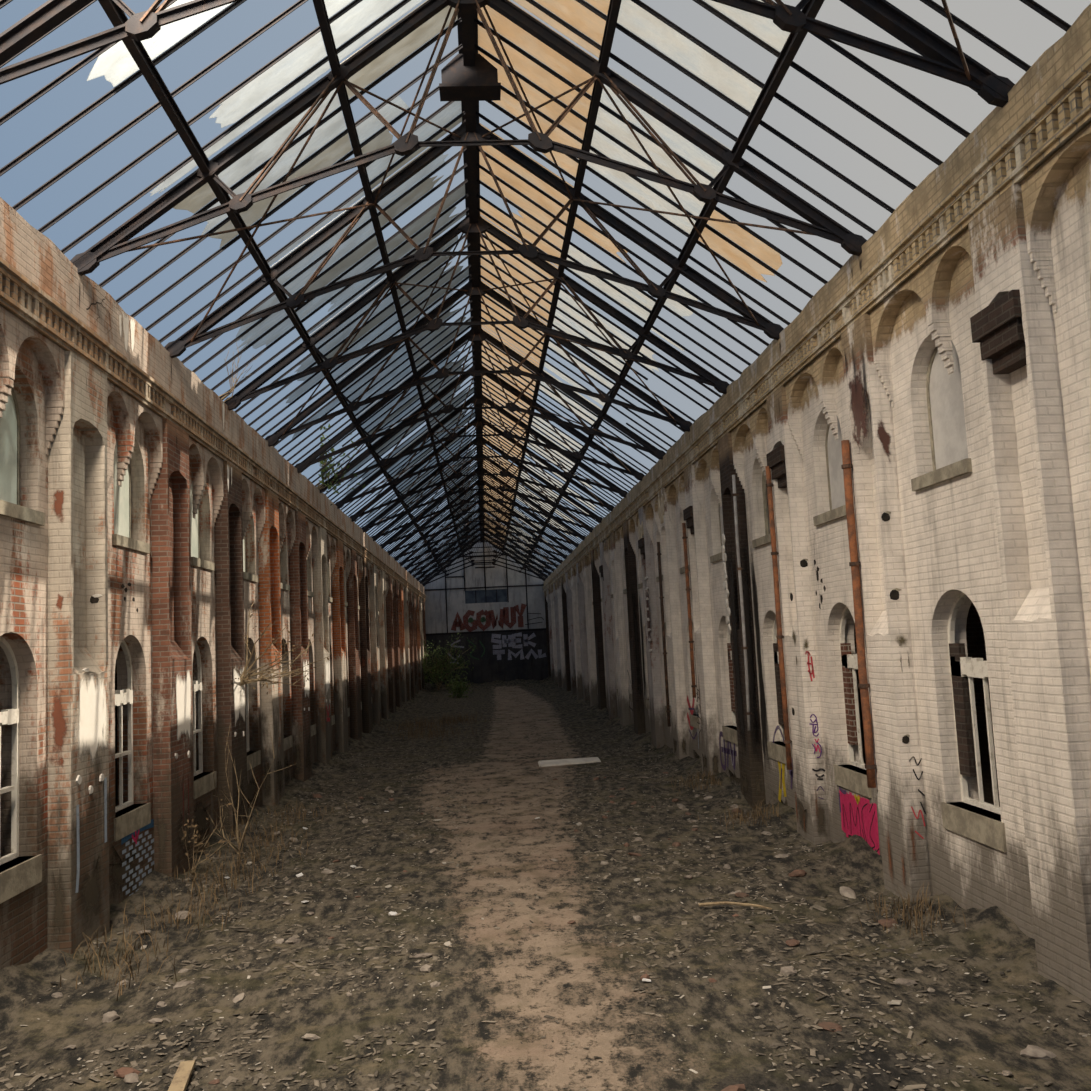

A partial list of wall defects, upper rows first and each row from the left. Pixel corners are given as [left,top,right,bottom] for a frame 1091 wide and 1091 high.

peeling [175,671,191,759]
peeling [233,668,245,737]